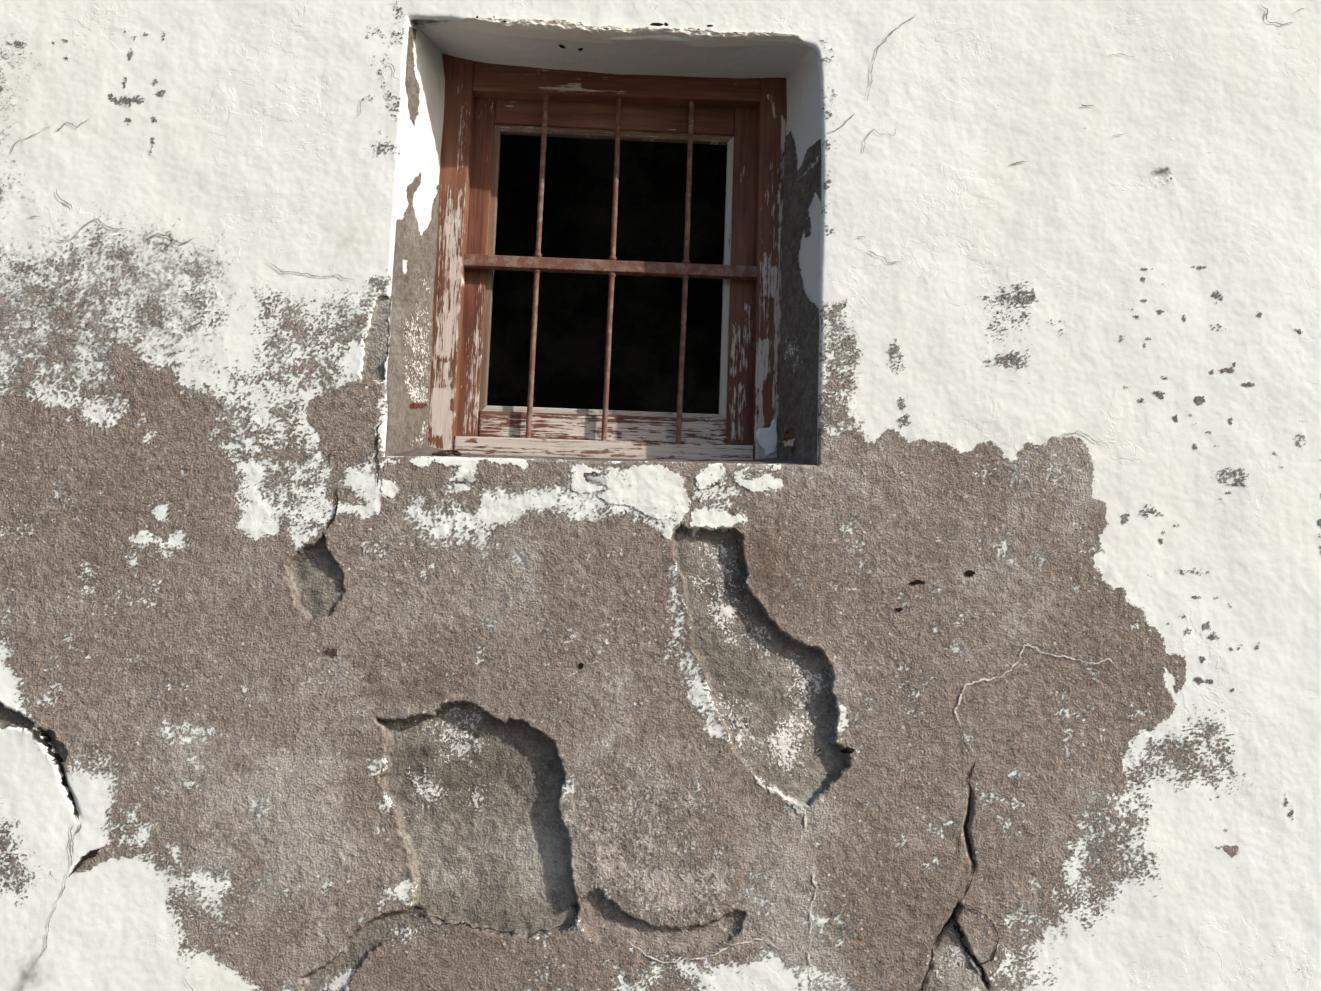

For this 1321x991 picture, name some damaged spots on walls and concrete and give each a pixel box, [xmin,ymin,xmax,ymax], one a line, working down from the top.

peeling [356,1,420,126]
peeling [108,77,166,125]
peeling [819,300,856,336]
peeling [974,278,1065,370]
peeling [886,339,906,374]
peeling [897,397,911,427]
peeling [1121,504,1164,524]
peeling [1180,615,1219,640]
crack [918,642,1118,991]
peeling [0,820,53,906]
crack [19,729,100,991]
peeling [1216,829,1240,857]